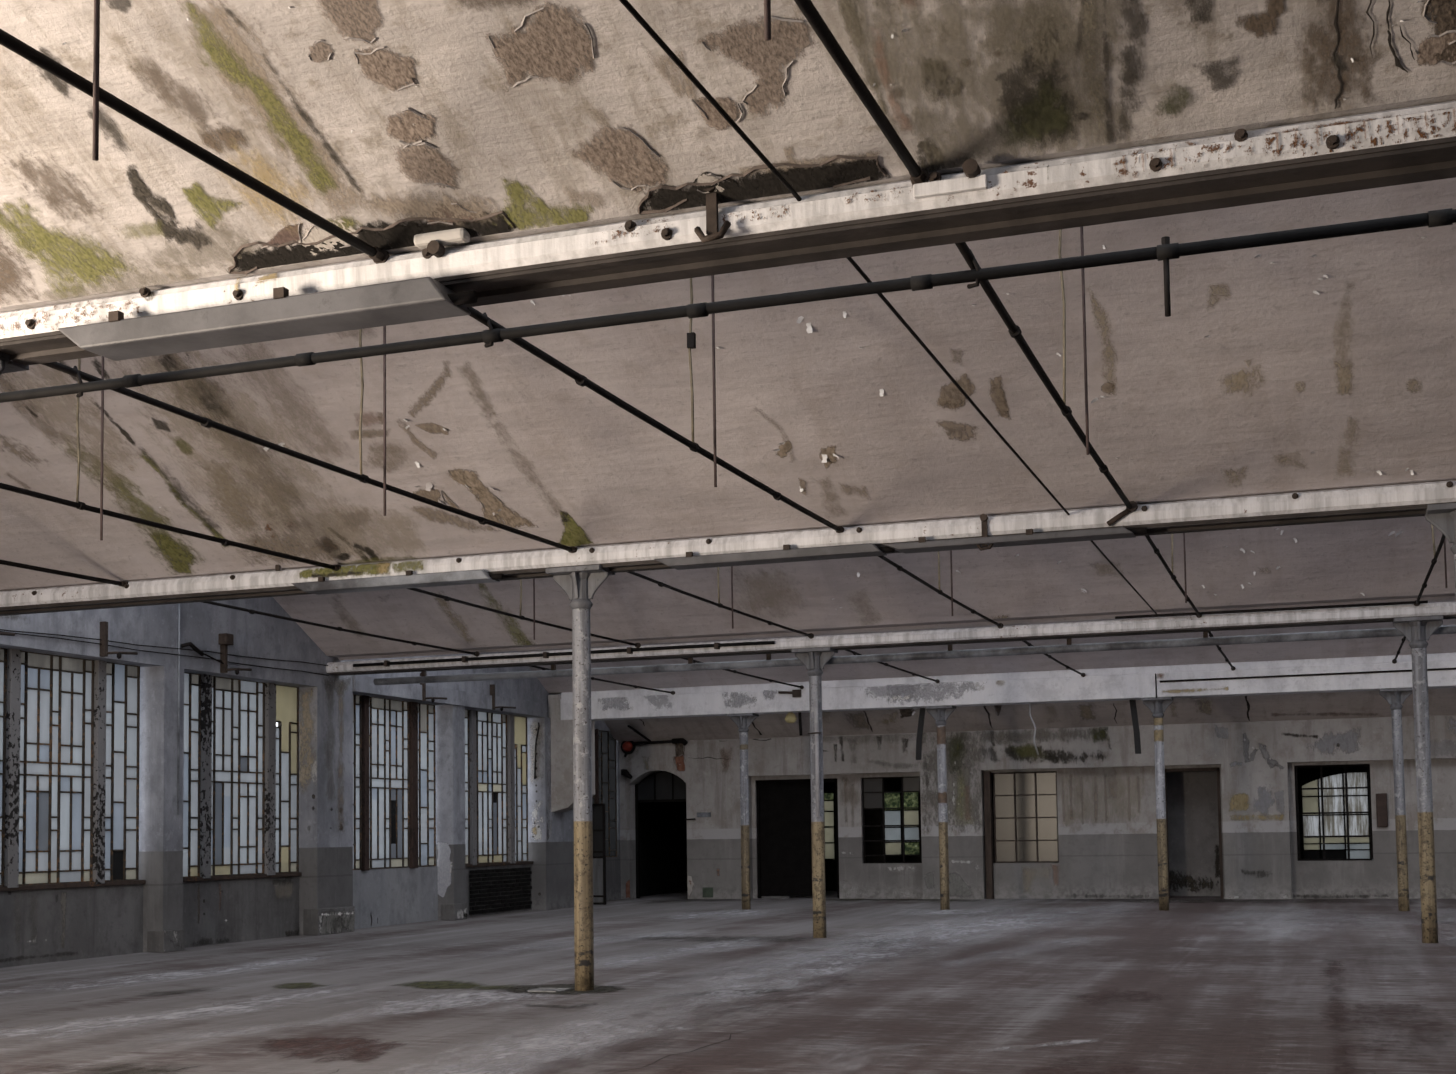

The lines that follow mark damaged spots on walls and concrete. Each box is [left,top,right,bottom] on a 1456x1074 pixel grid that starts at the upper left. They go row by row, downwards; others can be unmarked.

flaking render [308,0,417,91]
flaking render [662,16,814,130]
leakage [839,0,1147,172]
crack [1386,0,1415,73]
flaking render [1415,0,1456,66]
leakage [11,158,92,214]
mould [87,107,210,250]
flaking render [227,108,516,274]
corrosion [1114,109,1456,177]
corrosion [0,292,154,332]
leakage [903,705,1115,831]
flaking render [437,842,541,919]